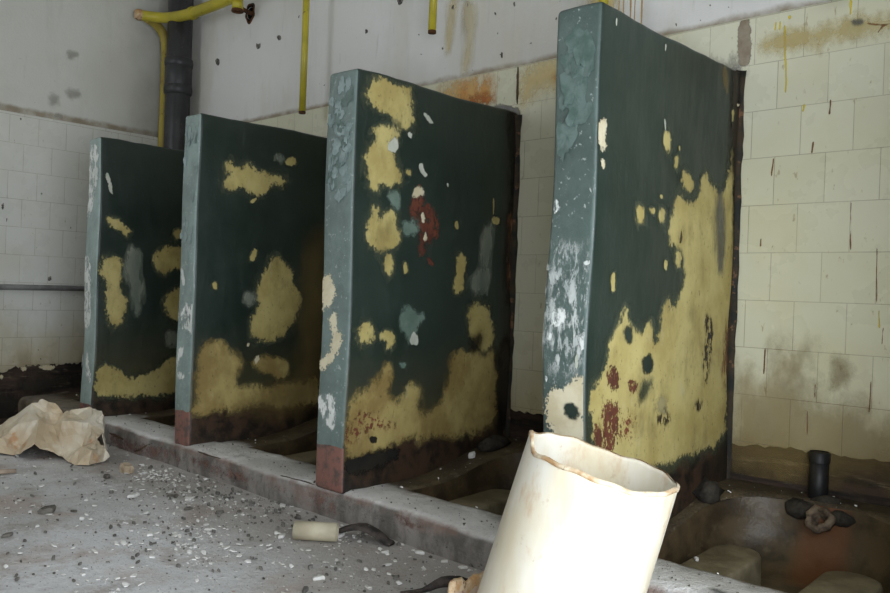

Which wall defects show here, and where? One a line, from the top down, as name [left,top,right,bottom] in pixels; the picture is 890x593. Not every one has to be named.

leakage [765,20,890,48]
corrosion [443,77,493,105]
peeling [556,23,596,161]
peeling [87,144,113,218]
peeling [183,124,198,174]
peeling [221,154,298,204]
peeling [326,74,433,281]
peeling [82,198,501,460]
peeling [542,117,734,471]